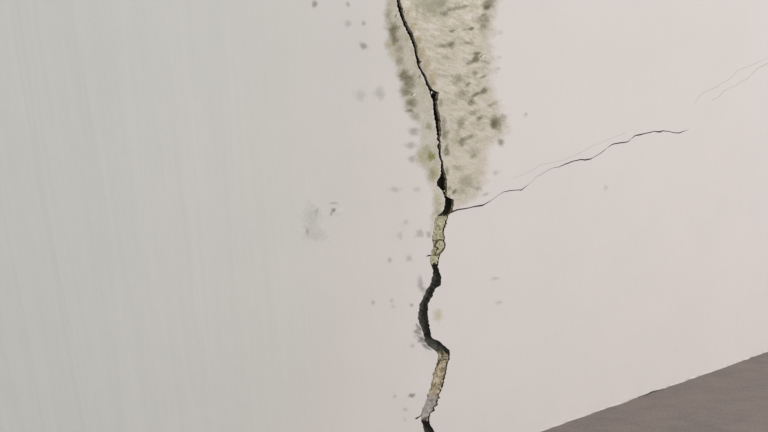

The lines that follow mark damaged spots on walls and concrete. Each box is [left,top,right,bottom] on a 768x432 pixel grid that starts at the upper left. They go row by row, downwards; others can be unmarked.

water stain [386,0,503,216]
crack [397,0,686,432]